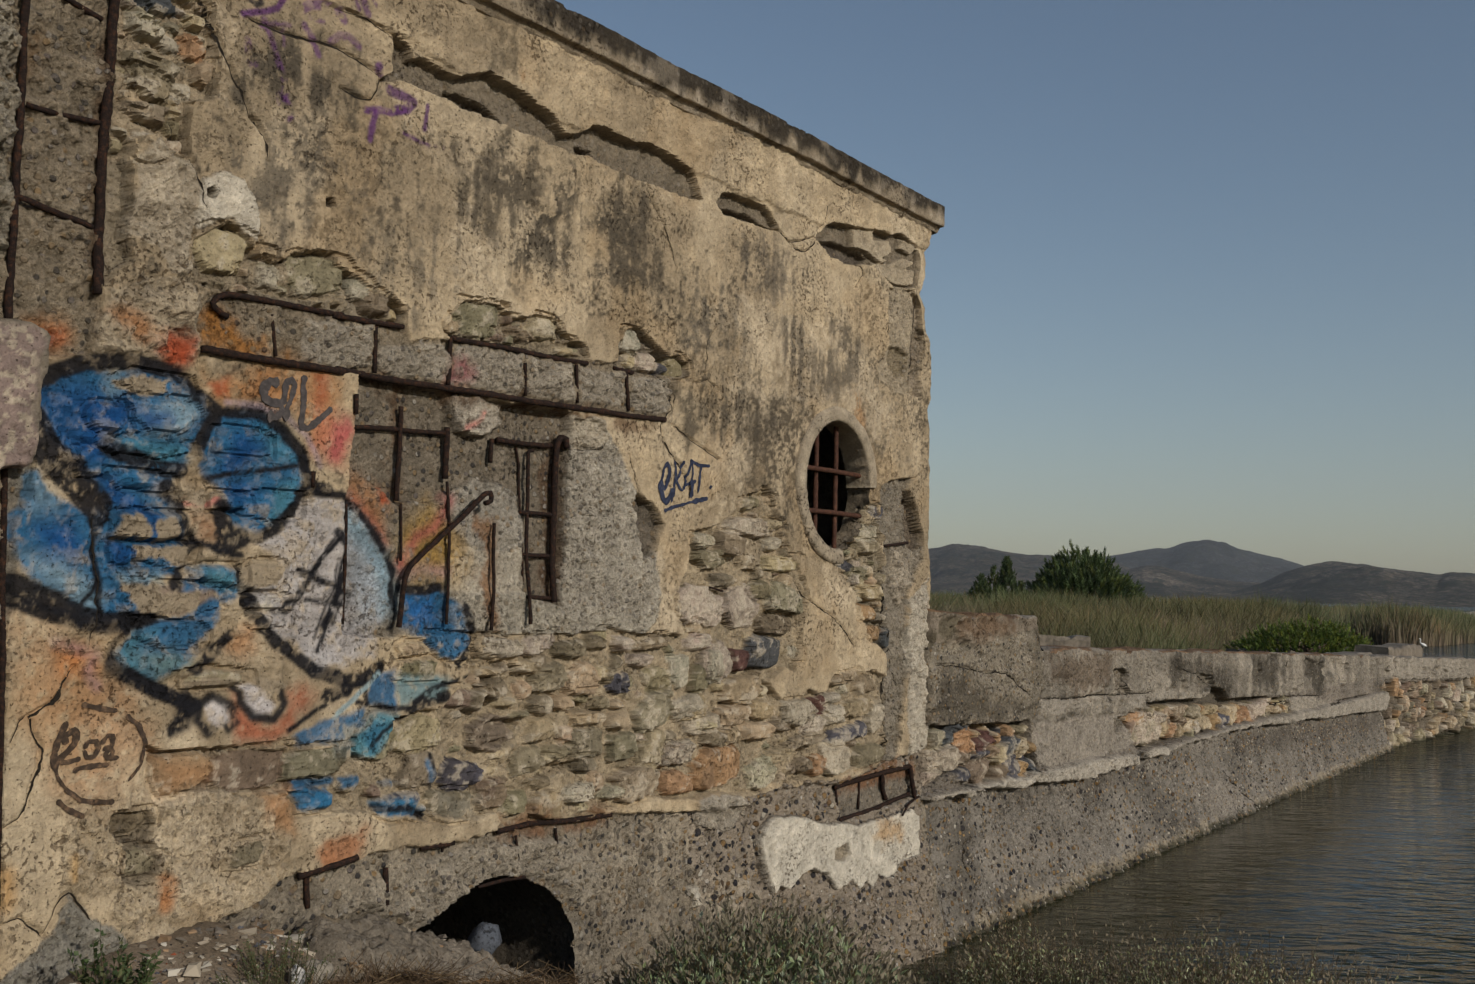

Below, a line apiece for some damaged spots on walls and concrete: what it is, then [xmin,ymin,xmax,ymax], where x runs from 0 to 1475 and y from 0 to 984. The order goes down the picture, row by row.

spalling [0,0,109,357]
corrosion [4,0,121,319]
crack [168,123,207,206]
damp [221,5,869,466]
crack [780,201,828,252]
corrosion [196,291,667,634]
spalling [209,293,679,638]
flaking render [109,810,157,874]
spalling [119,477,945,984]
corrosion [832,753,920,847]
spalling [1113,667,1132,694]
spalling [1146,671,1268,705]